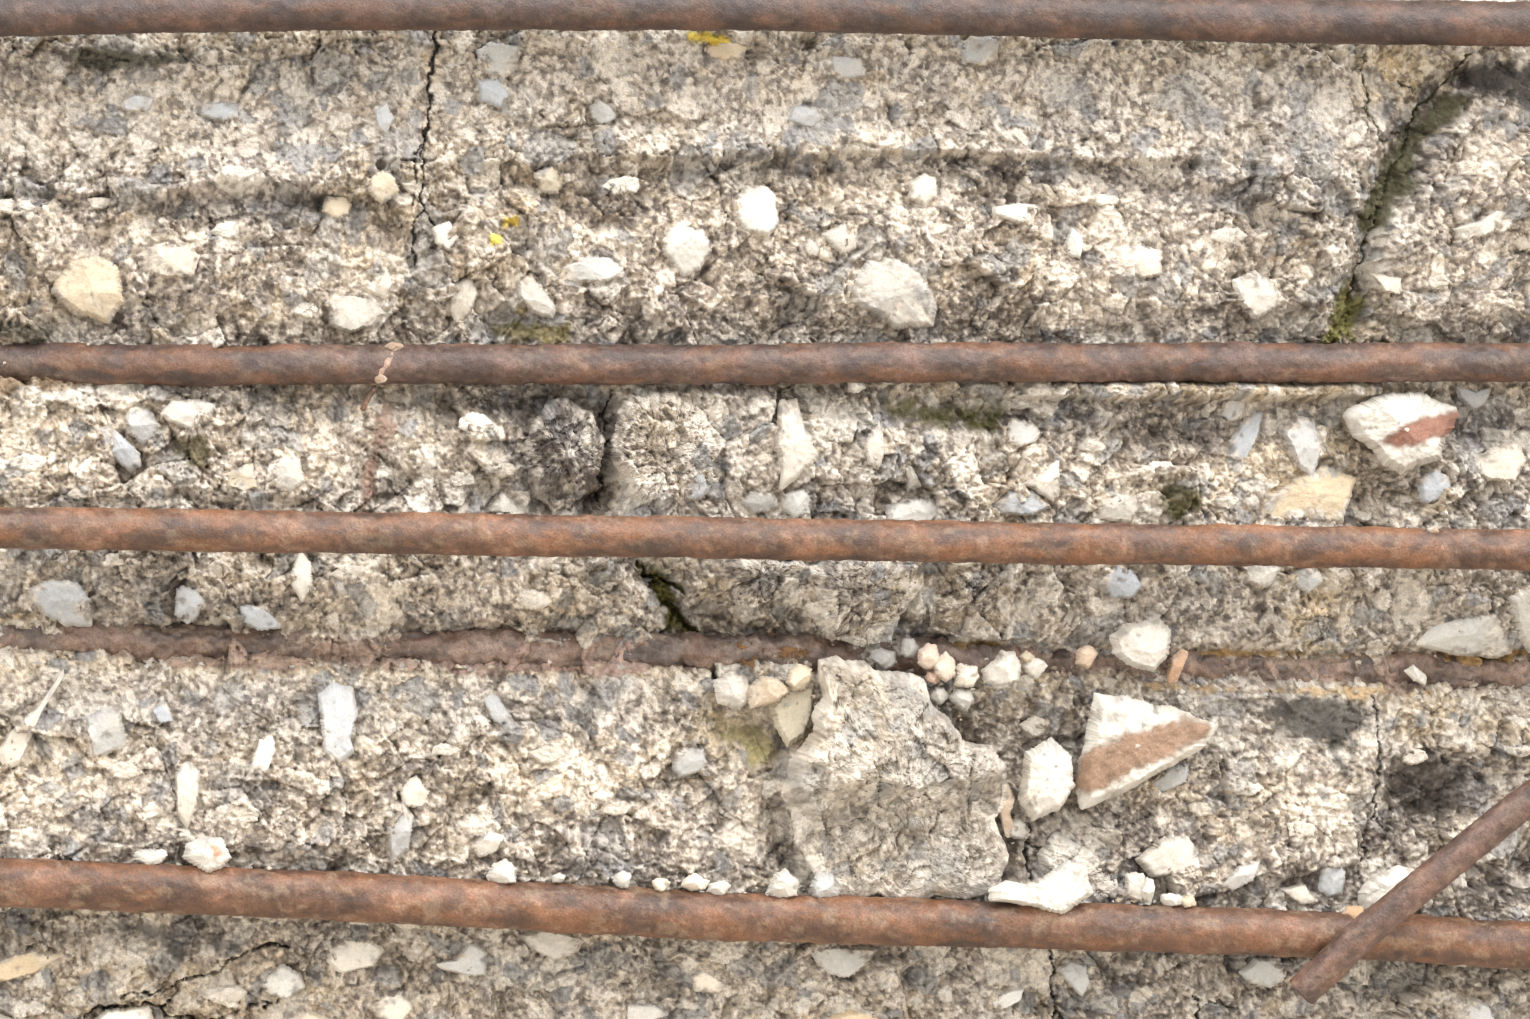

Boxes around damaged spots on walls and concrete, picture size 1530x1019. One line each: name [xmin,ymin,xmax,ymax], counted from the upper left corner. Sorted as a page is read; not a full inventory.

crack [1359,53,1471,143]
crack [411,31,440,266]
spalling [0,190,409,343]
spalling [450,169,1323,341]
crack [1347,221,1377,297]
rust [167,632,419,671]
rust [1043,647,1432,701]
rust [1437,649,1530,687]
spalling [0,693,823,878]
spalling [1098,745,1530,905]
rust [1342,905,1364,919]
crack [84,942,289,1019]